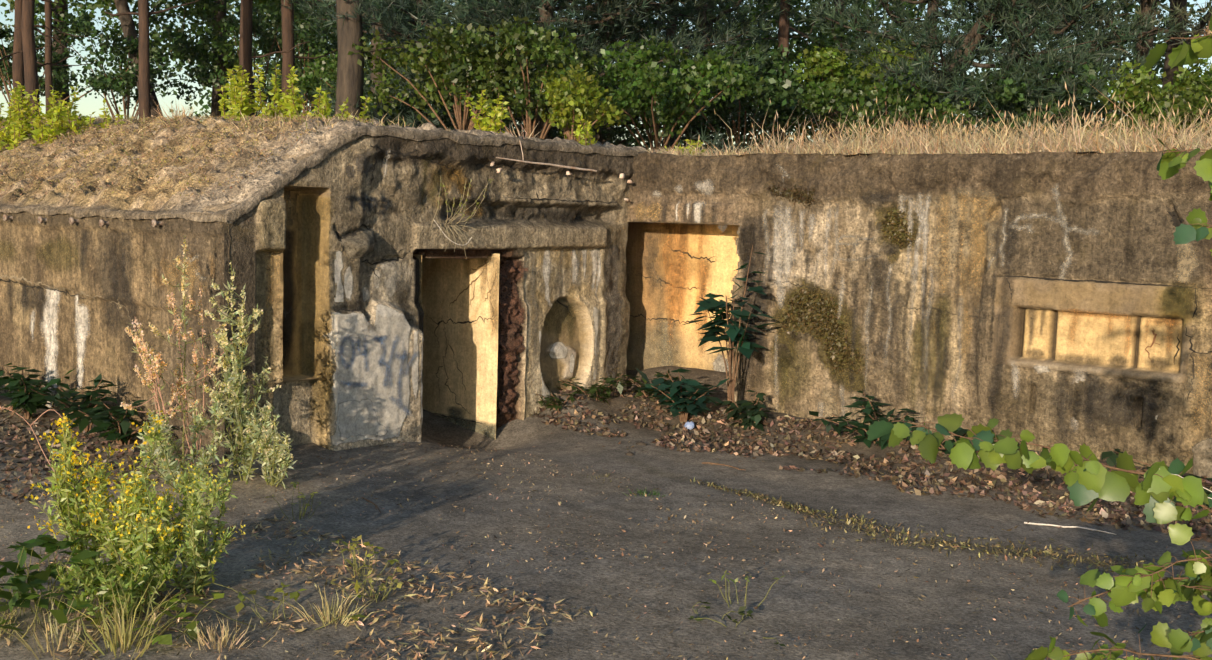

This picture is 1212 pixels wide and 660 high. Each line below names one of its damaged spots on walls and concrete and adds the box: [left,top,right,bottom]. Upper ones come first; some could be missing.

efflorescence [75,295,88,387]
crack [431,261,498,424]
damp [743,197,961,388]
crack [771,184,1212,402]
damp [974,266,1017,407]